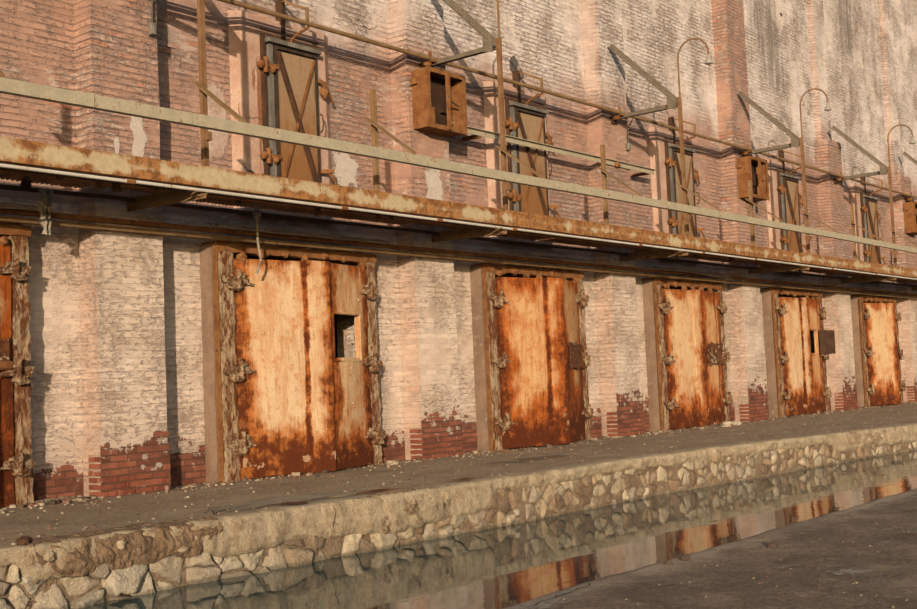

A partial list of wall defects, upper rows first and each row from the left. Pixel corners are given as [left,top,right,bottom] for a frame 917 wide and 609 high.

peeling [33,460,84,501]
peeling [100,424,206,497]
peeling [381,429,405,463]
peeling [421,405,478,460]
peeling [590,408,602,438]
peeling [616,390,650,437]